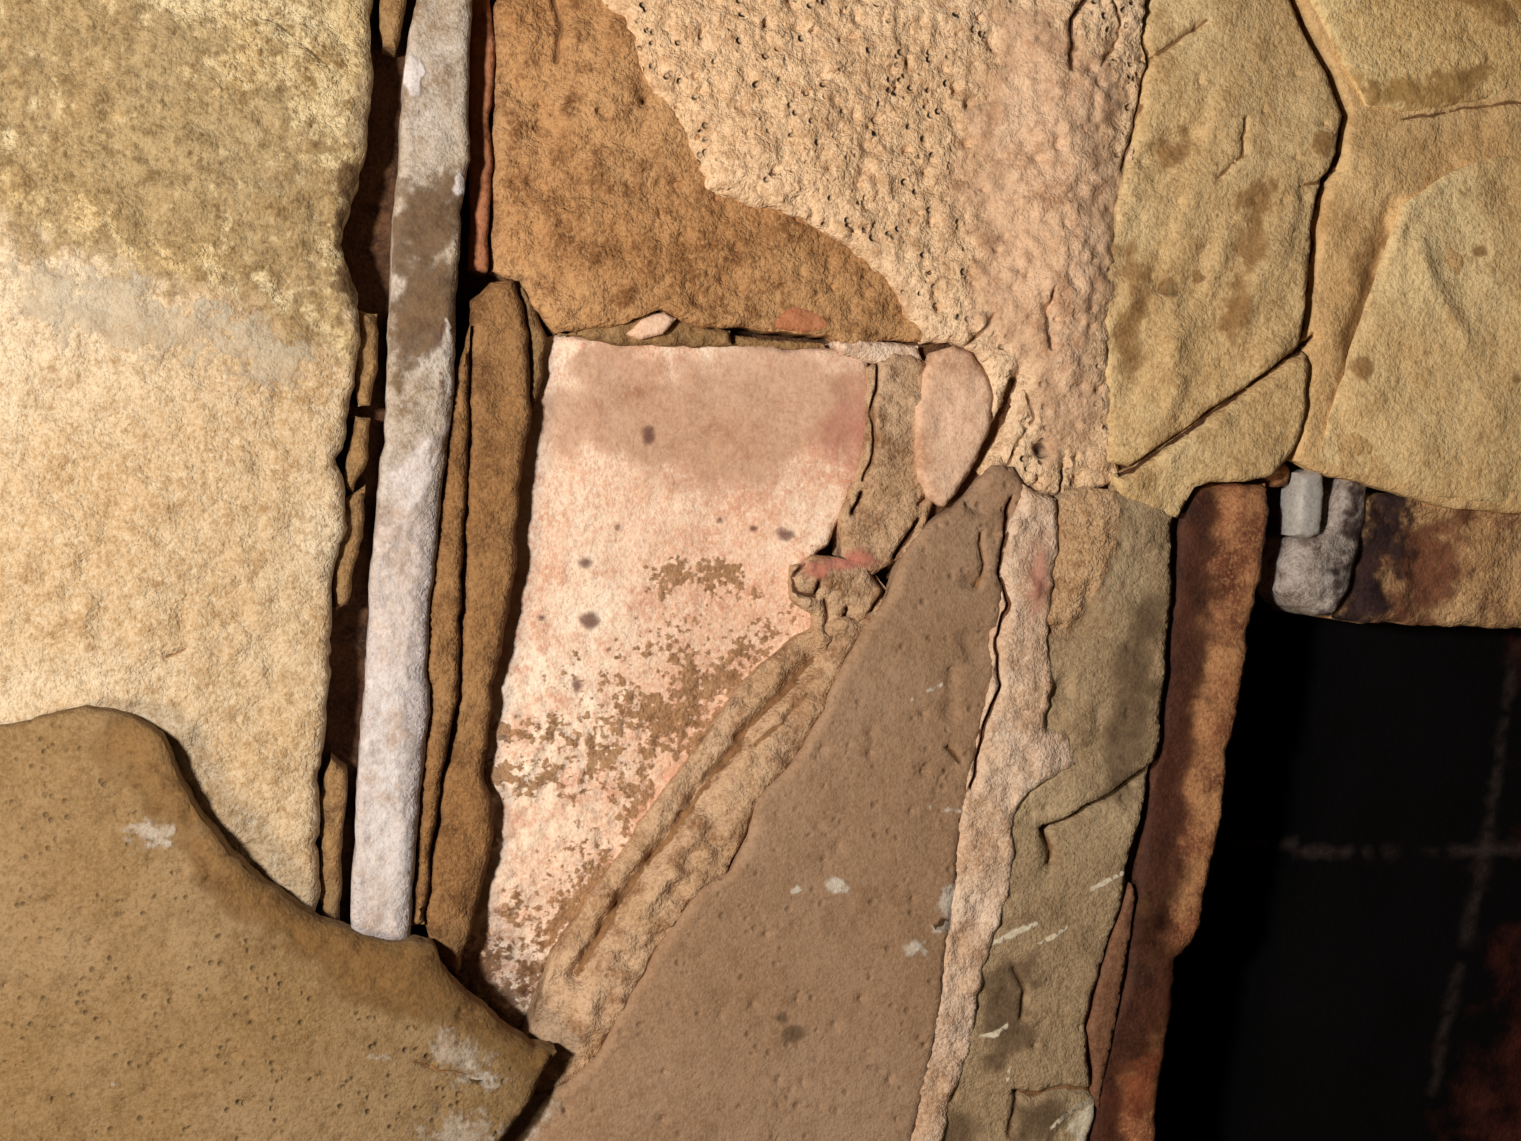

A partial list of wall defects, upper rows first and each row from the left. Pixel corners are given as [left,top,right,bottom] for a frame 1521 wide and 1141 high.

leakage [0,0,374,401]
leakage [388,173,462,391]
spalling [488,0,994,507]
crack [1068,0,1207,172]
crack [1118,62,1344,476]
leakage [97,716,550,1141]
leakage [525,1096,559,1141]